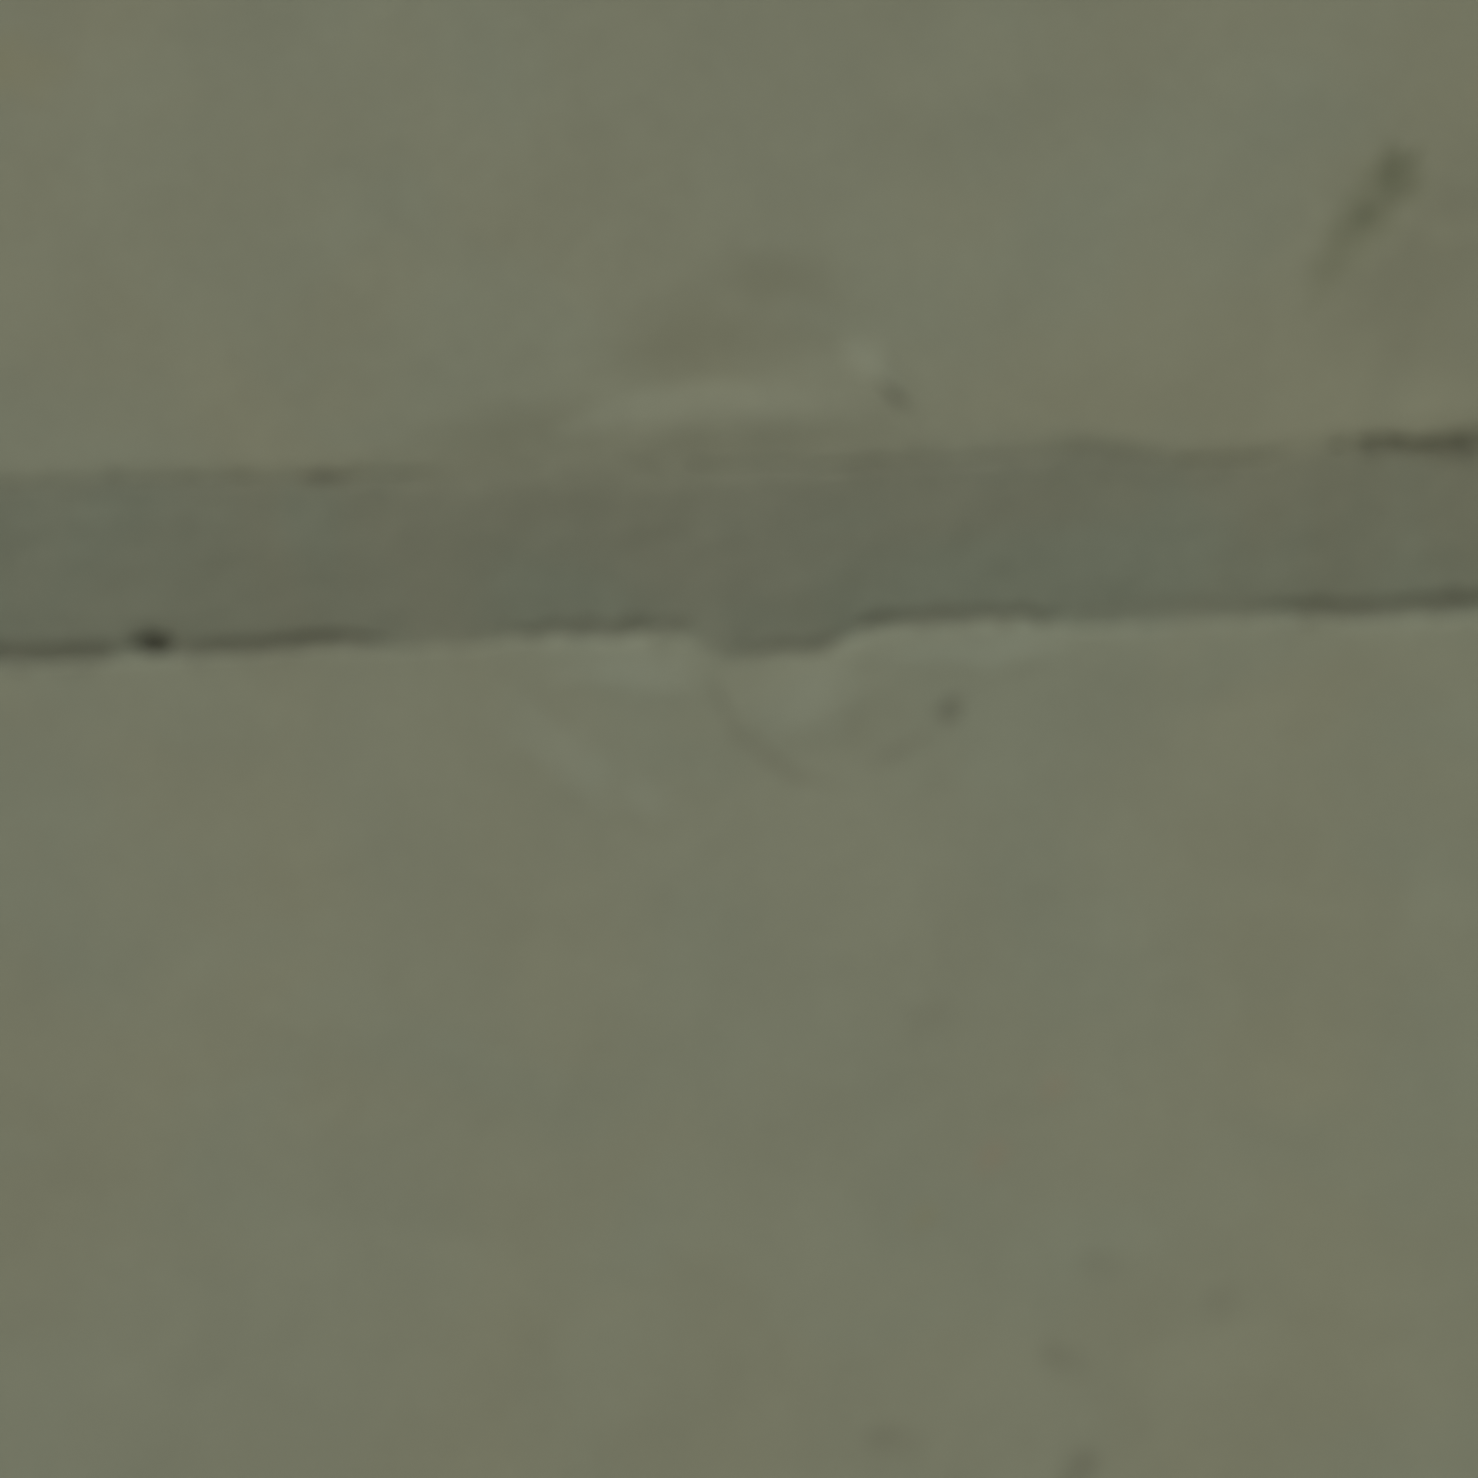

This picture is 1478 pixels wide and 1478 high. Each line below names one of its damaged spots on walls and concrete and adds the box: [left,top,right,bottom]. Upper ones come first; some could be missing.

crack [1341,424,1478,469]
crack [0,625,390,683]
crack [504,609,696,647]
crack [740,579,1478,659]